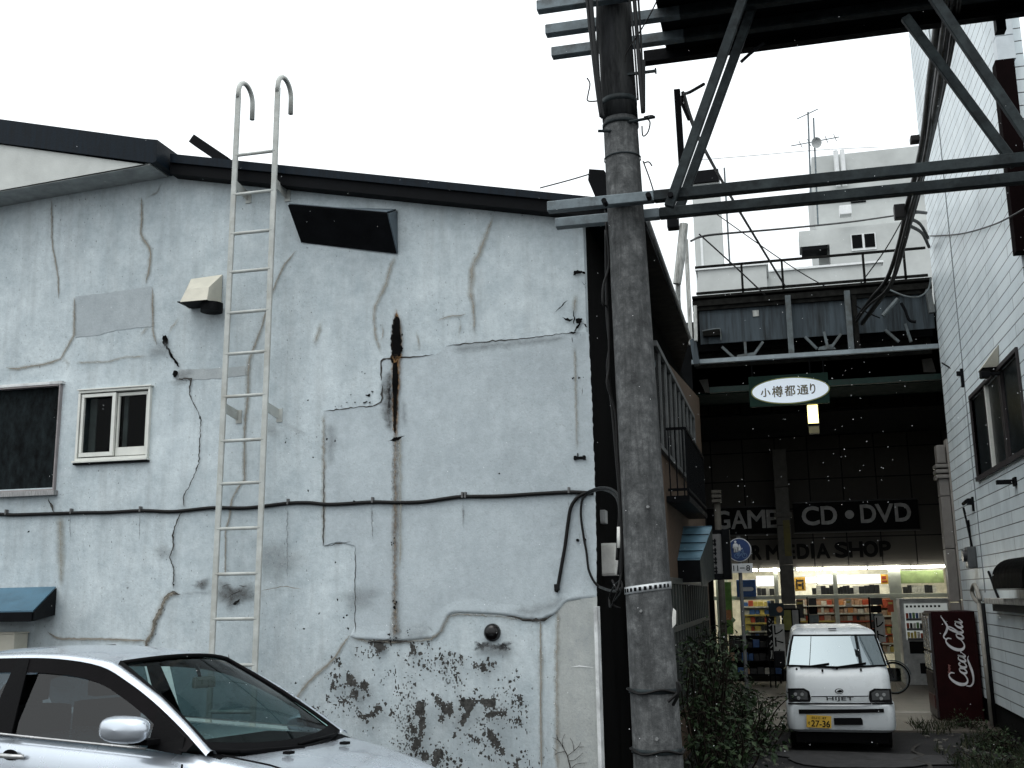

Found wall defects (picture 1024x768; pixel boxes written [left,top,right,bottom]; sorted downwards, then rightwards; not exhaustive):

crack [6,189,202,646]
rust [387,312,410,643]
peeling [305,639,545,768]